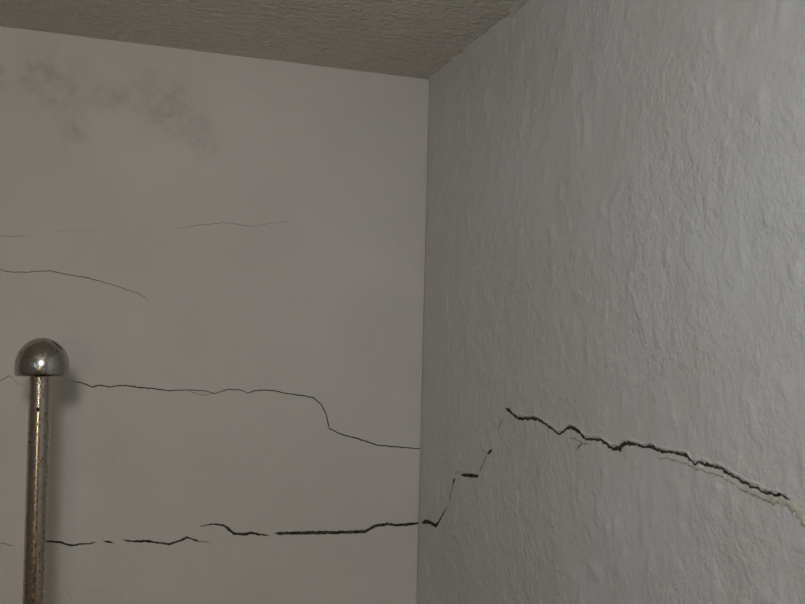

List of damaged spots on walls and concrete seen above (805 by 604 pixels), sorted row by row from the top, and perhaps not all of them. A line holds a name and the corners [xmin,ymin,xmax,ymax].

crack [0,269,145,298]
crack [73,381,420,449]
crack [46,408,805,546]